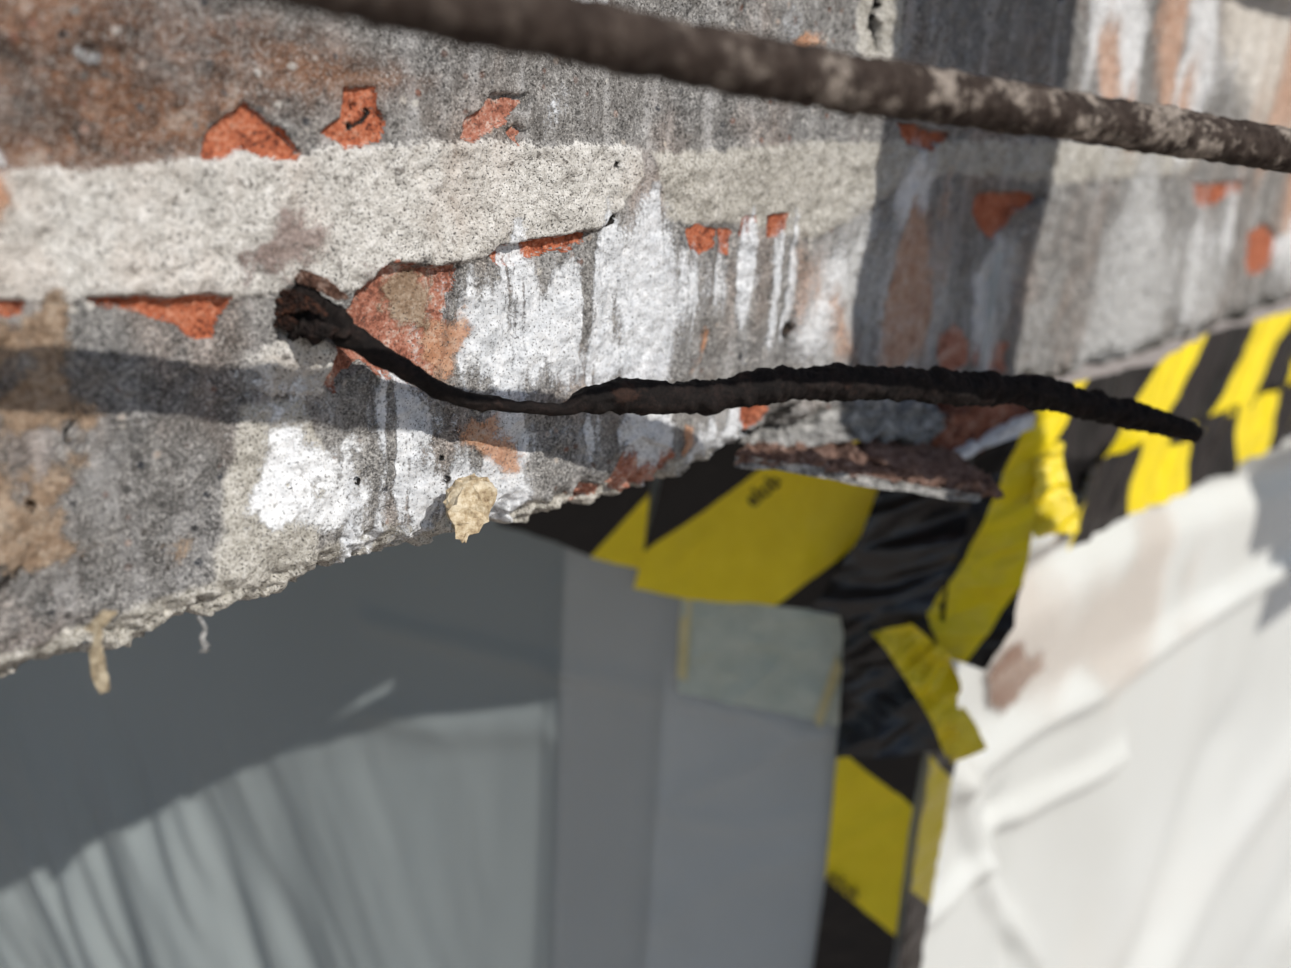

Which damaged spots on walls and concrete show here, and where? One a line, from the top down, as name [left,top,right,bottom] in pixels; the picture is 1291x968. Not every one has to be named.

corrosion [1097,17,1136,101]
corrosion [1154,0,1195,109]
spalling [201,103,302,161]
spalling [236,0,1291,208]
corrosion [240,208,327,285]
spalling [489,230,585,266]
spalling [85,293,233,340]
corrosion [365,267,471,380]
damp [247,140,1021,564]
spalling [273,259,1203,443]
corrosion [460,415,520,473]
spalling [443,473,497,543]